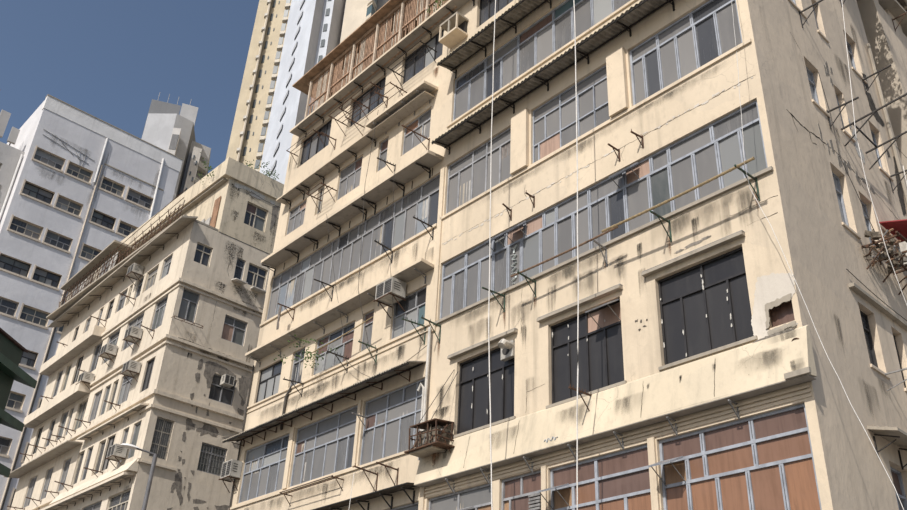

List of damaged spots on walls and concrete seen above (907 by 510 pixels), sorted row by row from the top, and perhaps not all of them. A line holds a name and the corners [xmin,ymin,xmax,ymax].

crack [786,109,898,219]
spalling [753,293,797,343]
peeling [167,359,251,510]